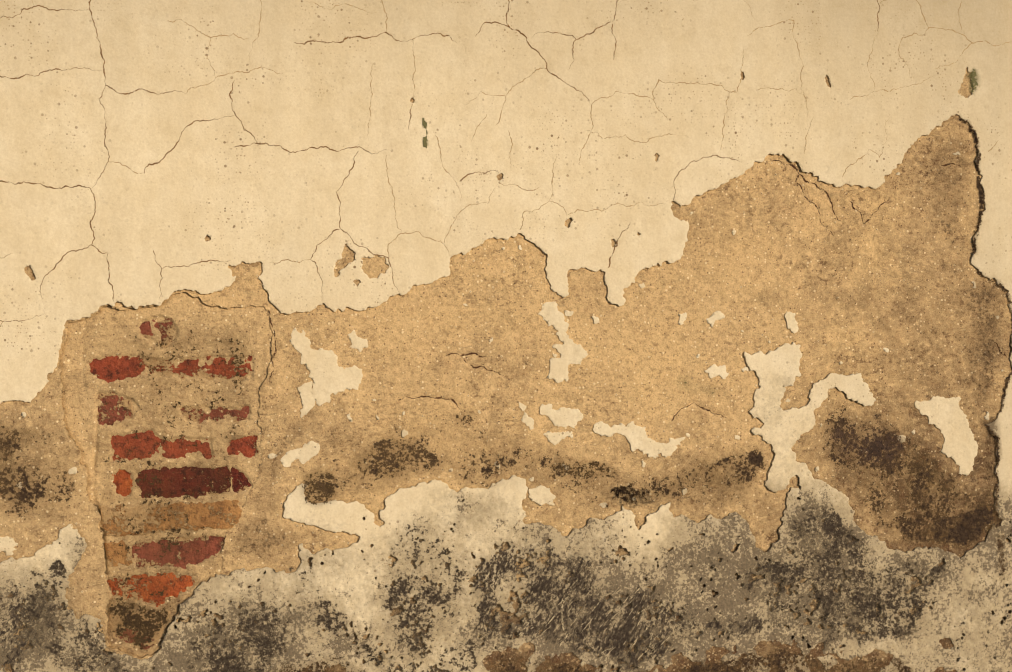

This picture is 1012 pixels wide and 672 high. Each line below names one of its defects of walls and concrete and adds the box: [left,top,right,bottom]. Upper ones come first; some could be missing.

crack [851,0,1009,99]
crack [0,0,890,327]
spalling [171,114,1012,582]
flaking render [0,292,274,660]
water stain [302,411,766,508]
water stain [821,373,1012,581]
water stain [0,558,129,672]
water stain [183,560,348,672]
spalling [482,642,602,672]
water stain [355,504,951,672]
spalling [639,639,894,672]
spalling [939,638,954,649]